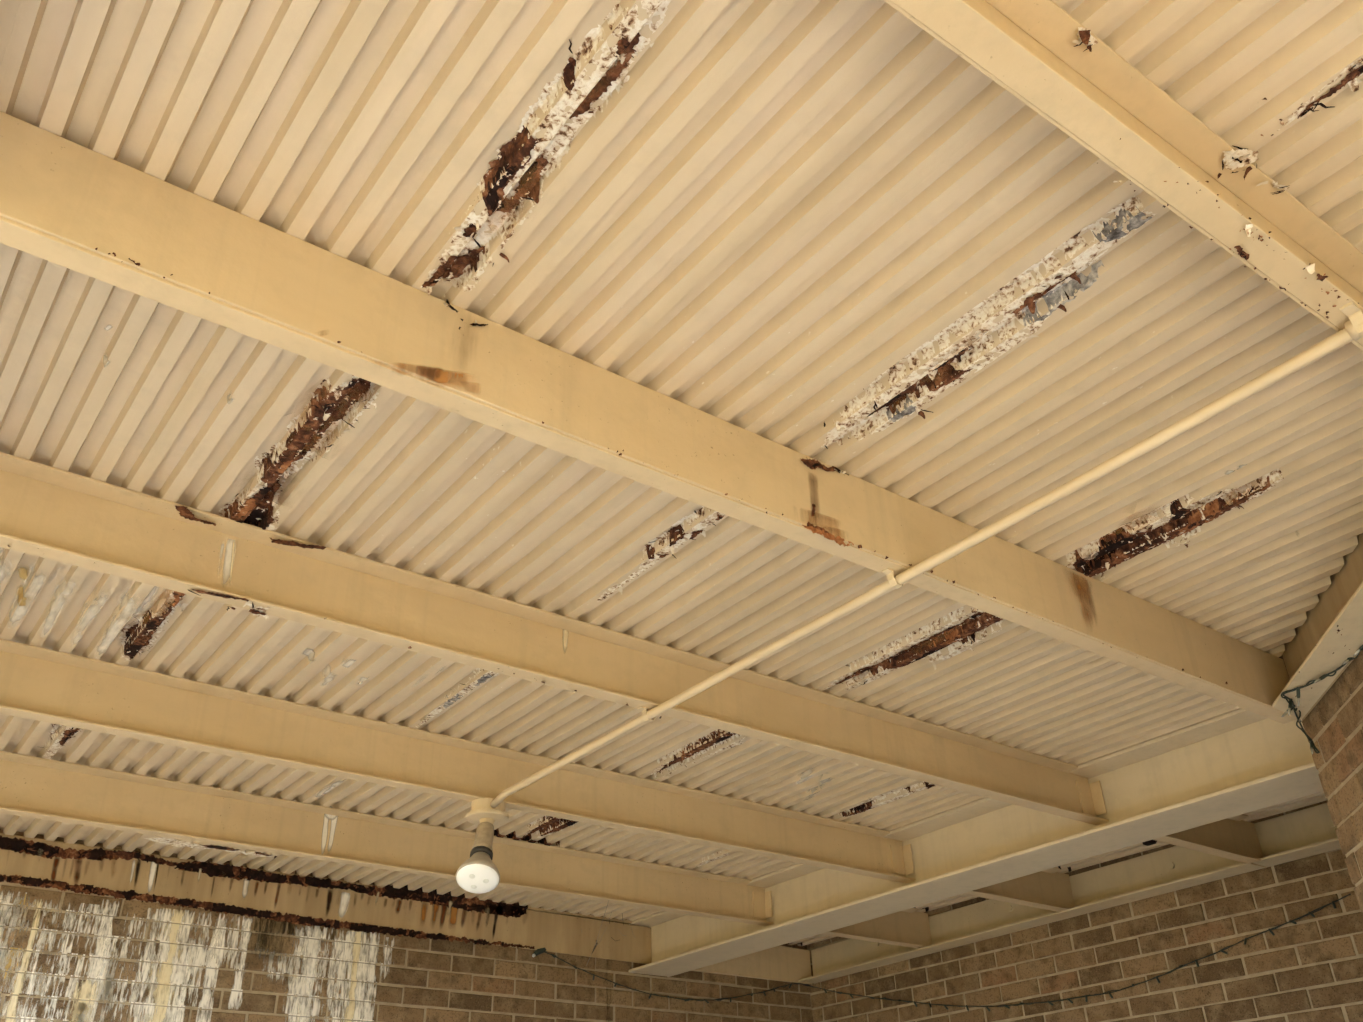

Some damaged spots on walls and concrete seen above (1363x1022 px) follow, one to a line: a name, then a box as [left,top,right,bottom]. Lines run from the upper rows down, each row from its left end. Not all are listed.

rust [420,0,671,295]
rust [1261,56,1363,136]
rust [175,375,379,550]
rust [1066,468,1284,619]
rust [119,589,270,662]
rust [826,594,1027,691]
rust [651,729,745,779]
water stain [131,861,159,890]
rust [0,835,534,949]
water stain [0,892,394,1022]